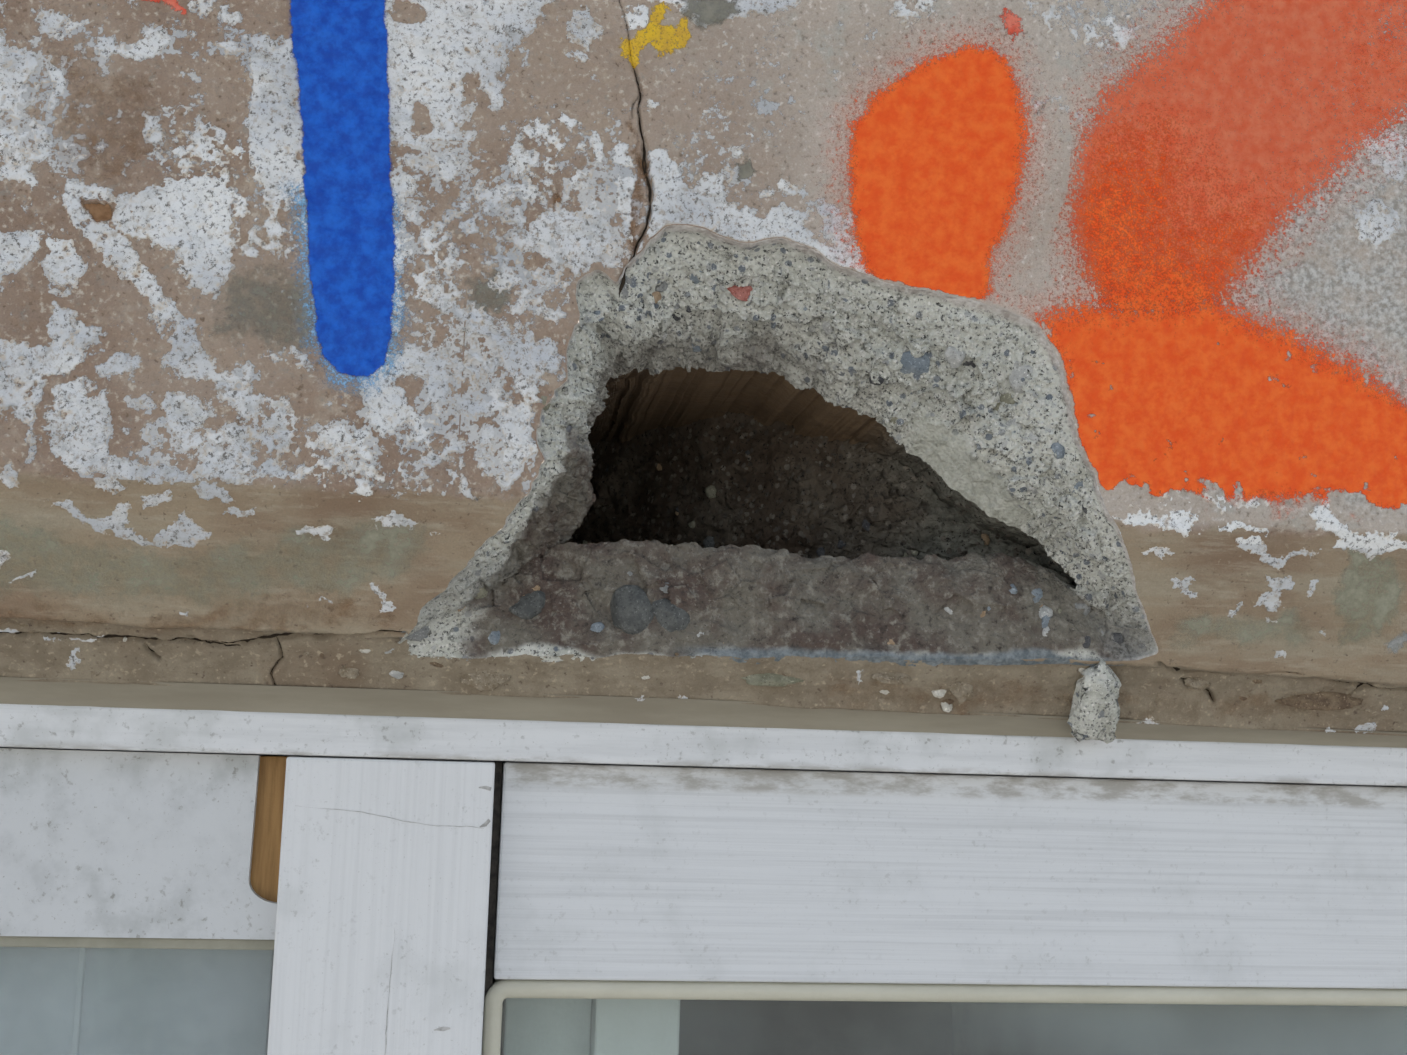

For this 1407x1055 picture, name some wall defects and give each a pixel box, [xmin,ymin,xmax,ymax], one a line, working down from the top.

crack [619,1,652,297]
spalling [0,0,1407,685]
crack [0,632,319,684]
peeling [1353,705,1389,734]